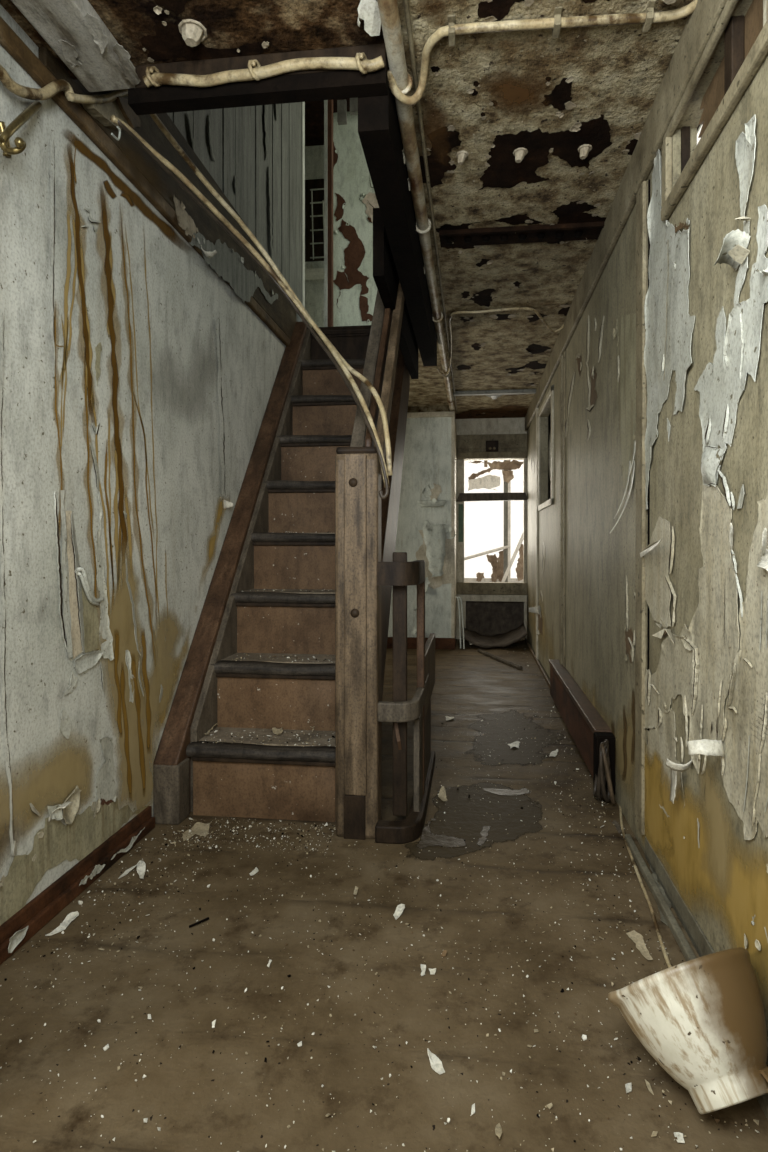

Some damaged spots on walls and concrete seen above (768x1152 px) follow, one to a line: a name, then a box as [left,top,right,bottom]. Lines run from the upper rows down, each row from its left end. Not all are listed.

spalling [477,0,534,22]
peeling [173,195,278,304]
peeling [333,193,373,323]
peeling [360,175,379,223]
spalling [407,125,462,191]
spalling [436,200,607,267]
spalling [479,76,641,190]
rust [54,134,183,660]
peeling [610,115,768,840]
peeling [0,786,151,925]
damp [583,688,768,992]
peeling [8,926,28,953]